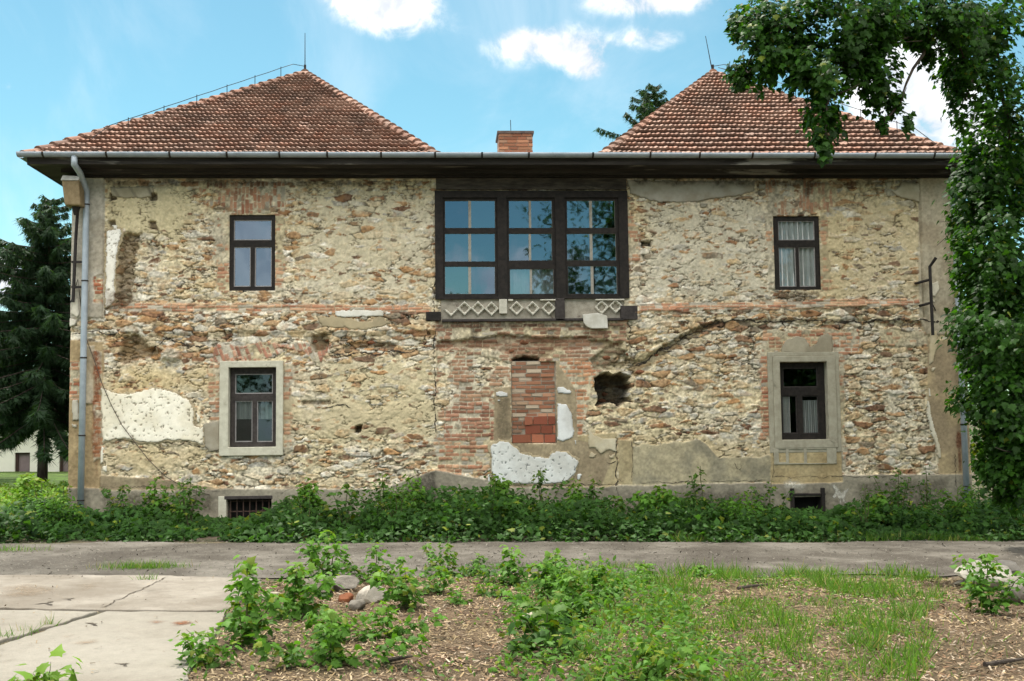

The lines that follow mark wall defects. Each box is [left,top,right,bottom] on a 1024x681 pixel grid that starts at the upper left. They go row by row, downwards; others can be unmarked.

flaking render [108,186,158,202]
flaking render [627,180,766,208]
spalling [103,219,159,314]
spalling [115,332,162,365]
flaking render [309,309,401,354]
spalling [436,319,722,407]
crack [628,296,939,366]
flaking render [928,331,938,371]
flaking render [100,386,219,472]
flaking render [925,389,941,458]